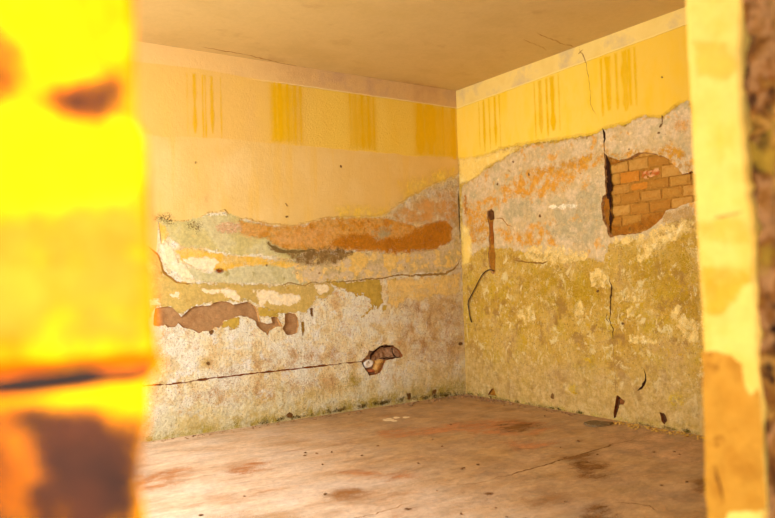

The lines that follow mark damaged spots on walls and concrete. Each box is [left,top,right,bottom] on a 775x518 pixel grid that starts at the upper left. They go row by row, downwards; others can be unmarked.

leakage [267,81,307,146]
leakage [533,75,561,136]
leakage [600,48,638,116]
peeling [152,100,697,335]
flaking render [362,344,403,376]
leakage [318,486,374,501]